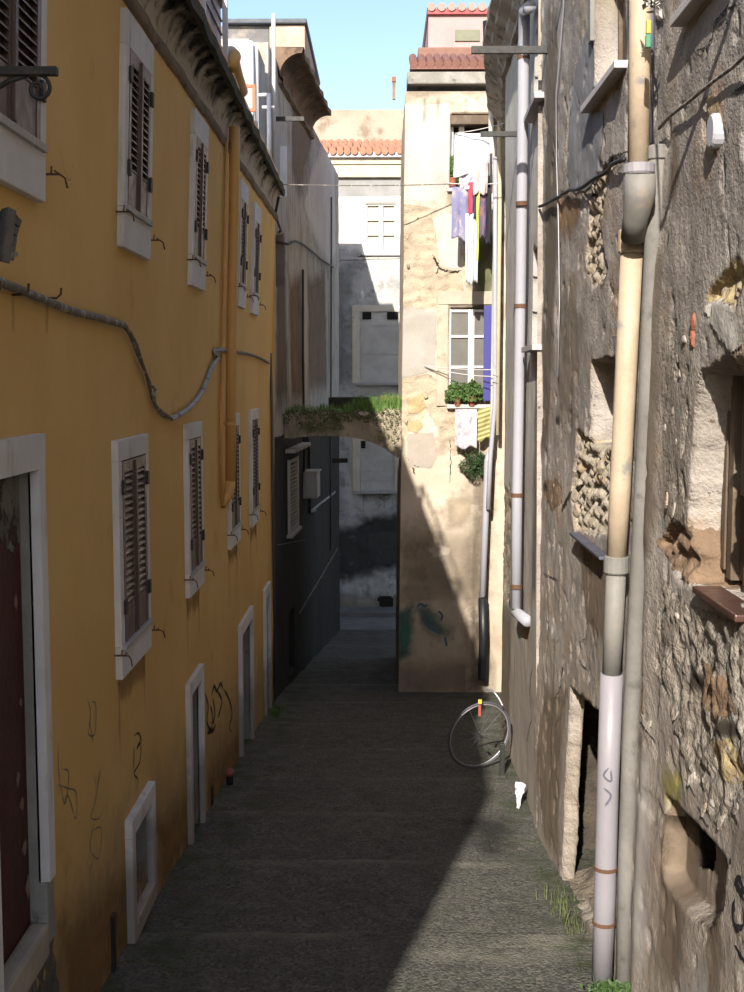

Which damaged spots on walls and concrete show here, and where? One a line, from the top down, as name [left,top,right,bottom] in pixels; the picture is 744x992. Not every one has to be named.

crack [691,0,740,55]
spalling [707,95,723,129]
spalling [585,155,618,289]
flaking render [704,259,744,355]
spalling [543,429,612,536]
spalling [653,330,744,926]
hole [577,700,599,849]